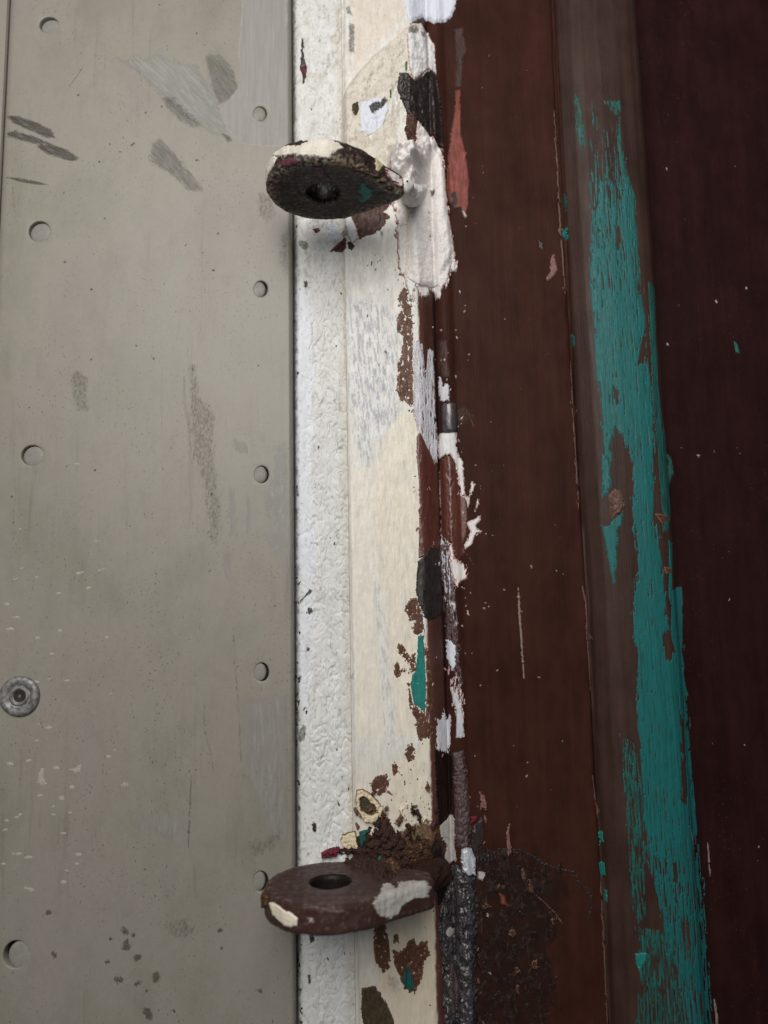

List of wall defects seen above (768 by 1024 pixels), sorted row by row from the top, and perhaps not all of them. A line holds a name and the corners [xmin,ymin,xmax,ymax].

peeling [405,111,416,141]
peeling [395,282,415,412]
peeling [570,335,580,508]
peeling [416,433,480,561]
peeling [573,94,718,1024]
peeling [369,598,436,796]
peeling [446,654,466,738]
rust [339,765,443,869]
peeling [371,880,447,995]
peeling [361,986,394,1024]